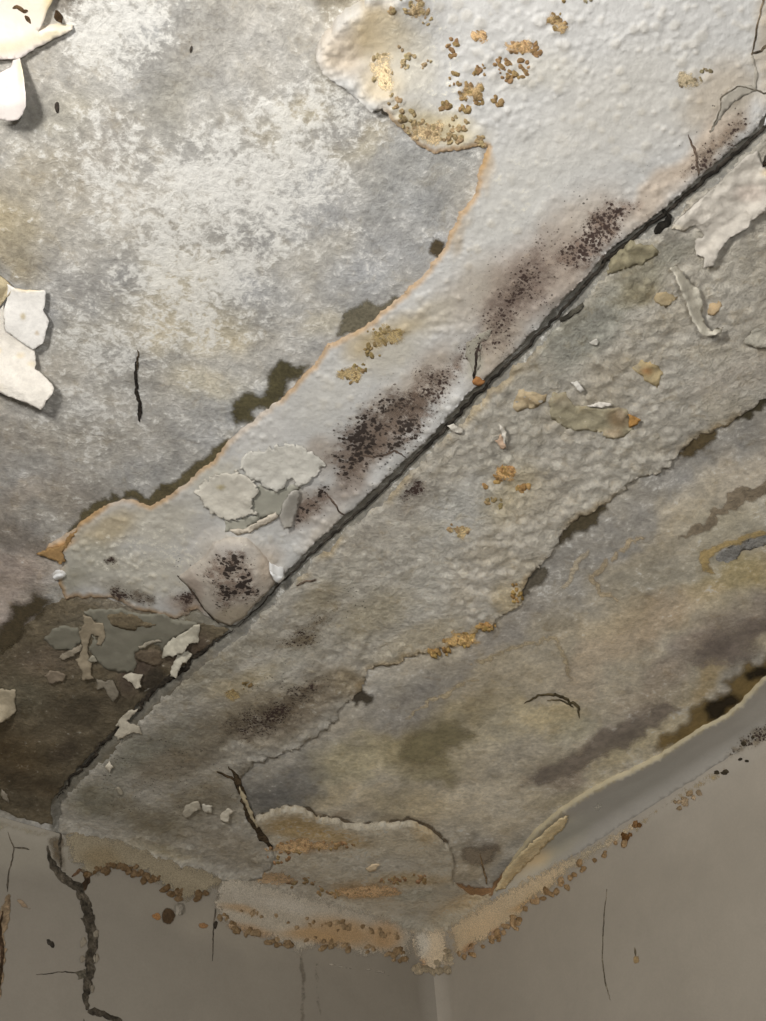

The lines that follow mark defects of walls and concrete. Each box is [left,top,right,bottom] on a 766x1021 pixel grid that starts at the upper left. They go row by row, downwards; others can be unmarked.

peeling [0,0,73,122]
corrosion [387,0,433,26]
corrosion [371,37,543,148]
corrosion [546,0,568,34]
peeling [36,0,766,620]
water stain [331,196,647,487]
crack [57,86,766,799]
peeling [44,184,766,938]
water stain [0,586,229,832]
water stain [533,620,766,785]
crack [217,766,272,850]
crack [0,833,122,1021]